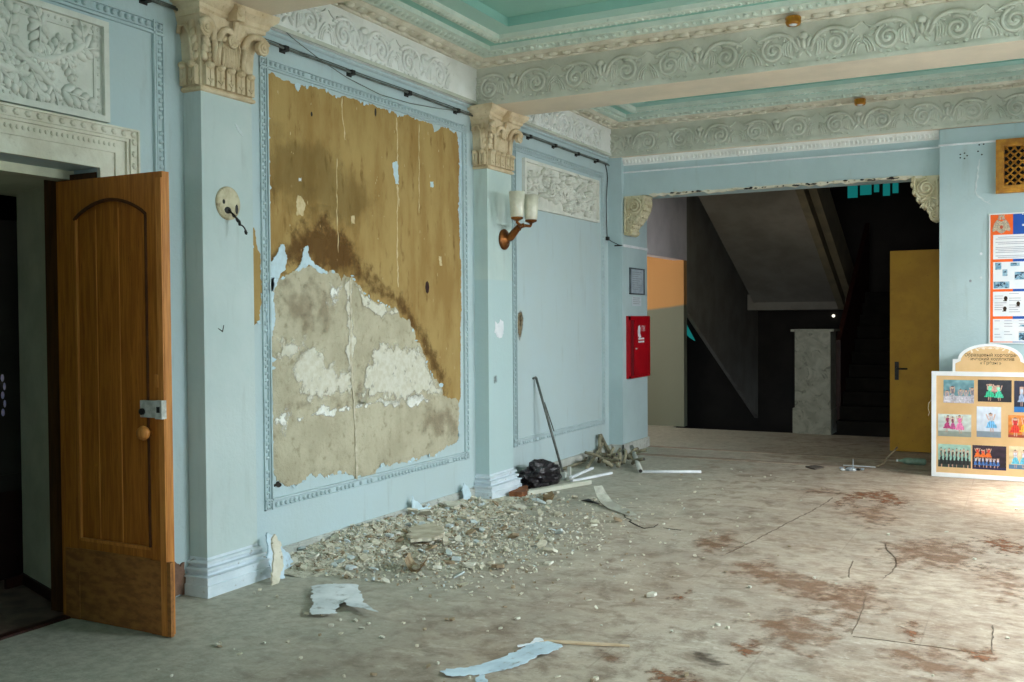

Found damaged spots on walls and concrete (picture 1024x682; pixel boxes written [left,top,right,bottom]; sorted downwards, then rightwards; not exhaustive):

damp [285,215,413,324]
peeling [253,72,462,488]
damp [422,337,442,379]
peeling [494,319,504,338]
crack [848,543,994,654]